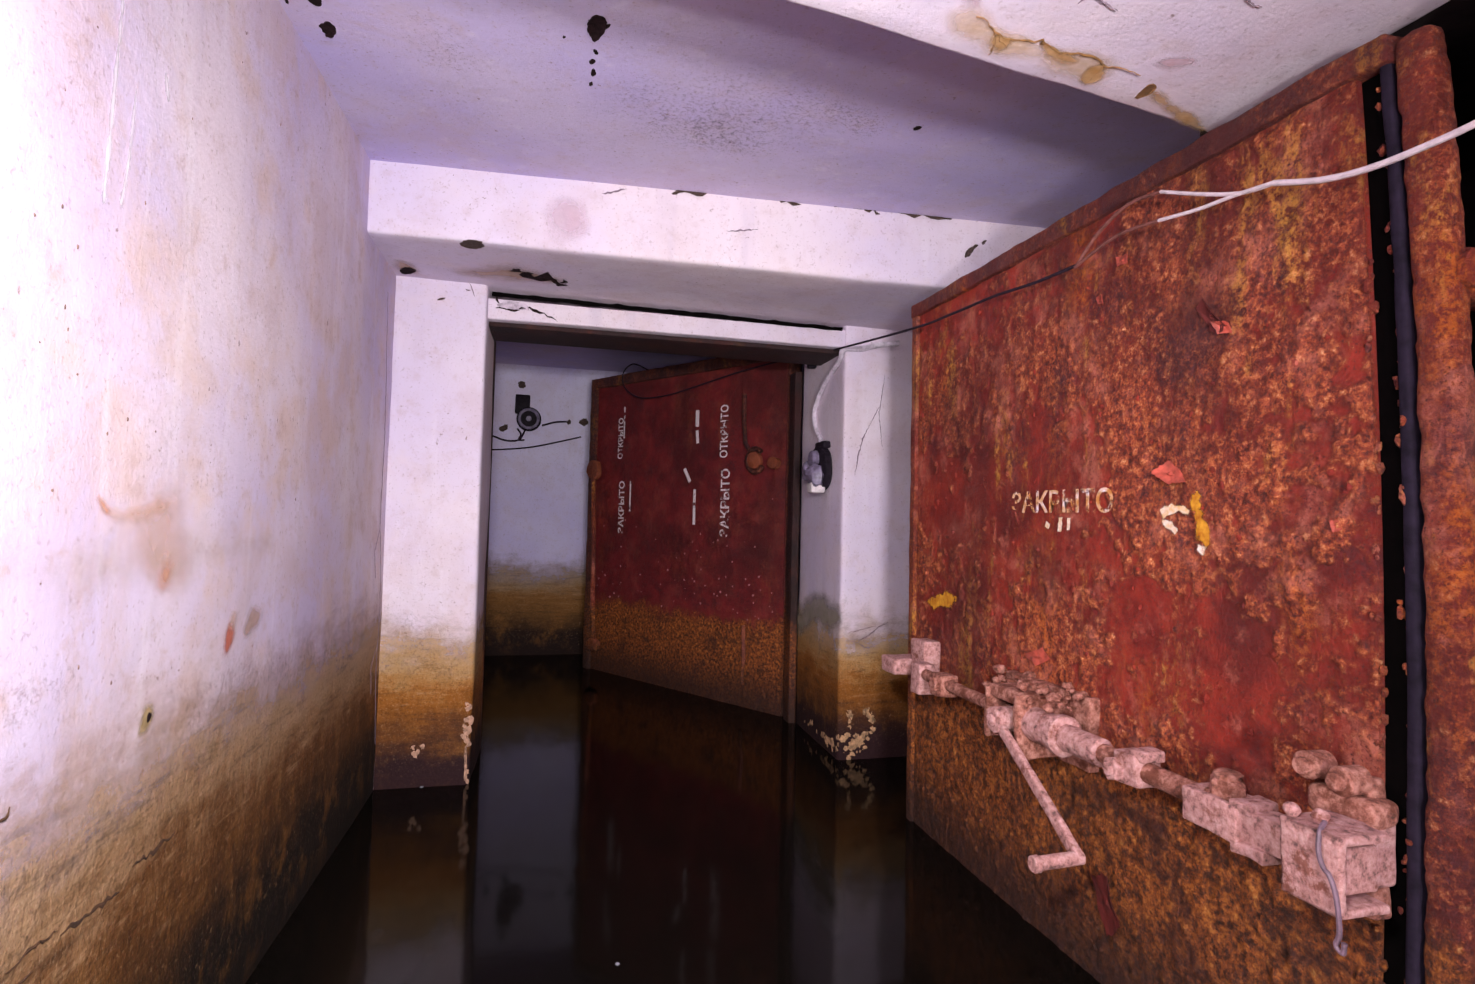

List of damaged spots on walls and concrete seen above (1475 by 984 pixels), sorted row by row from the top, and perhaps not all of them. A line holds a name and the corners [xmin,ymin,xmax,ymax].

rust [959,13,1104,83]
rust [1361,221,1394,315]
rust [1365,361,1407,475]
rust [921,440,1022,679]
rust [1190,491,1252,563]
rust [1369,599,1406,622]
damp [796,597,908,760]
rust [1373,663,1407,748]
damp [0,564,586,984]
rust [1401,817,1413,873]
rust [1370,924,1389,984]